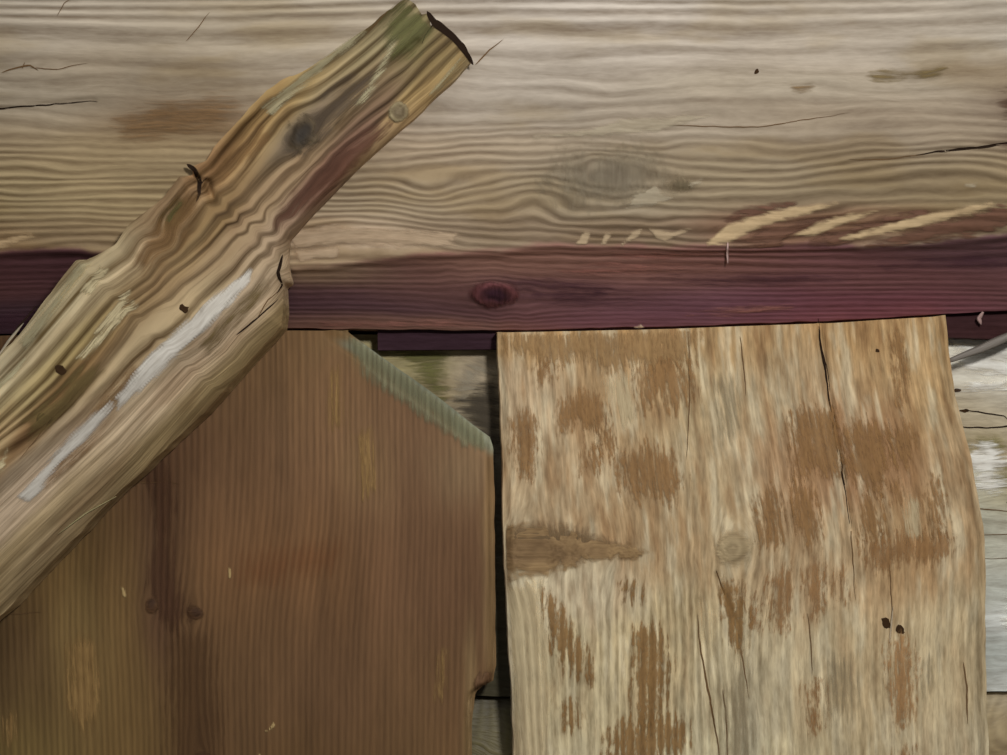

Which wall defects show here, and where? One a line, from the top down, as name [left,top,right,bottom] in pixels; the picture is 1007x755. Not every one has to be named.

crack [2,62,86,73]
crack [0,101,96,110]
crack [677,113,843,128]
crack [852,142,1007,160]
crack [818,319,856,599]